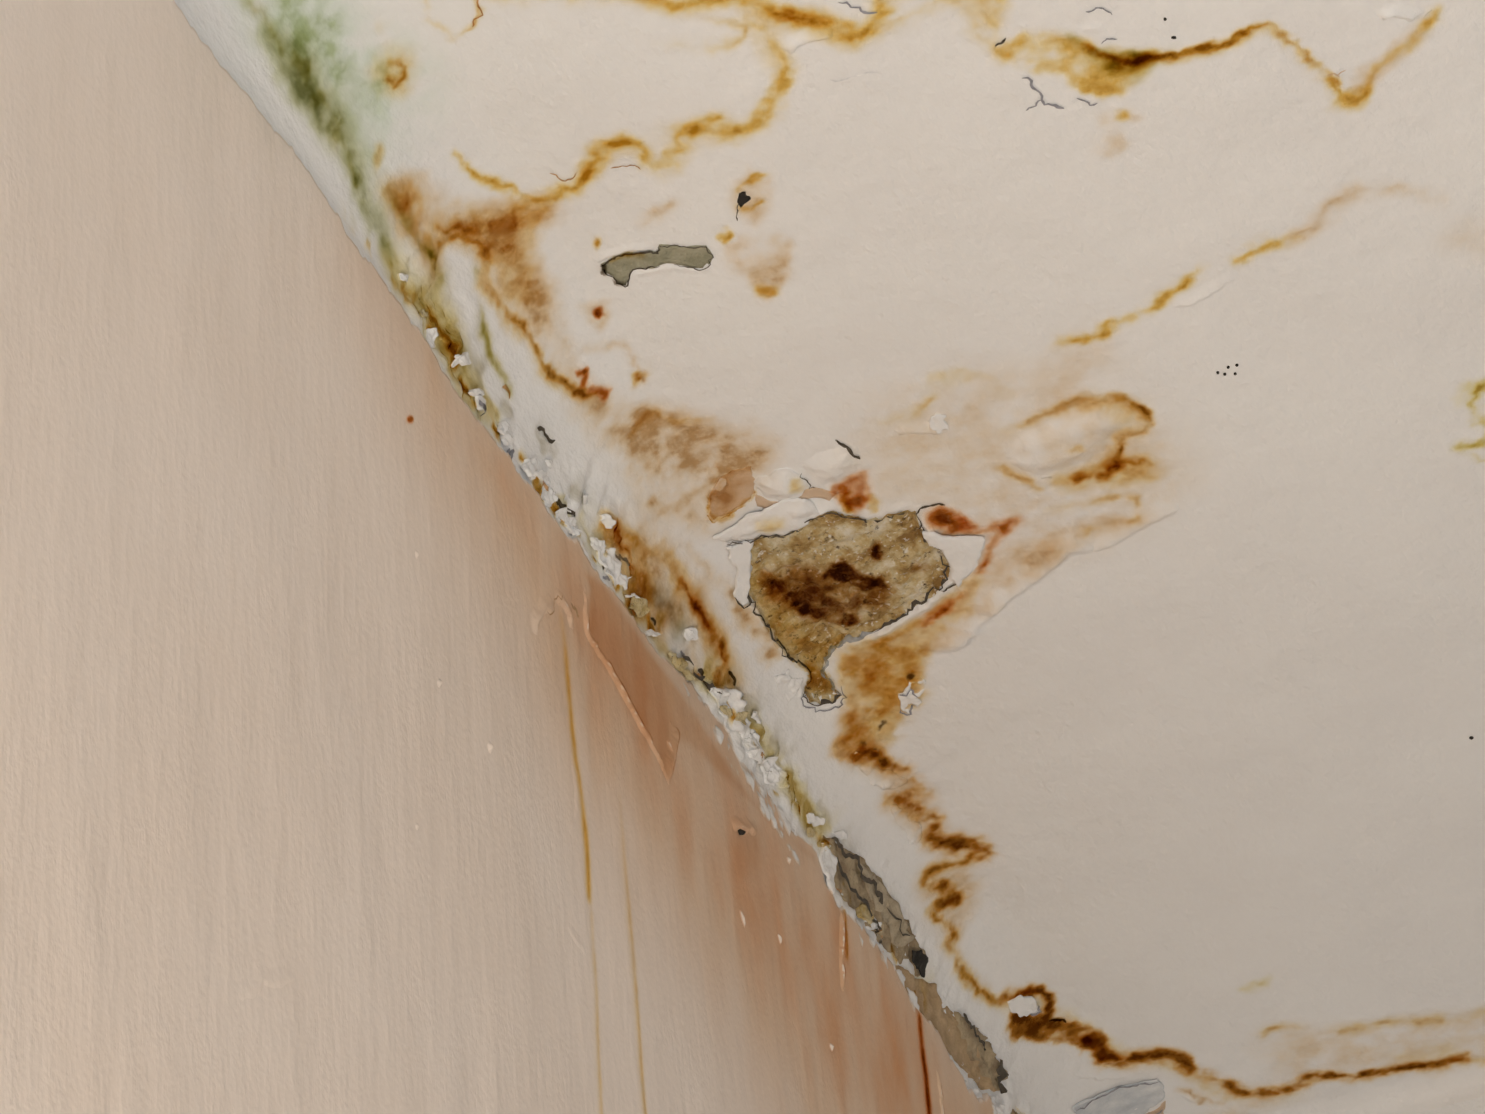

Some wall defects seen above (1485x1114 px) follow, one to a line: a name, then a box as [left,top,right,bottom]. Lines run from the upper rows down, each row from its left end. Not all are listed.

damp [1089,26,1260,70]
damp [291,70,320,120]
flaking render [592,242,717,287]
spalling [707,466,1179,716]
damp [847,729,906,770]
peeling [852,749,923,845]
damp [894,796,990,922]
damp [961,968,1196,1074]
flaking render [1064,1062,1257,1114]
damp [1224,1058,1463,1096]